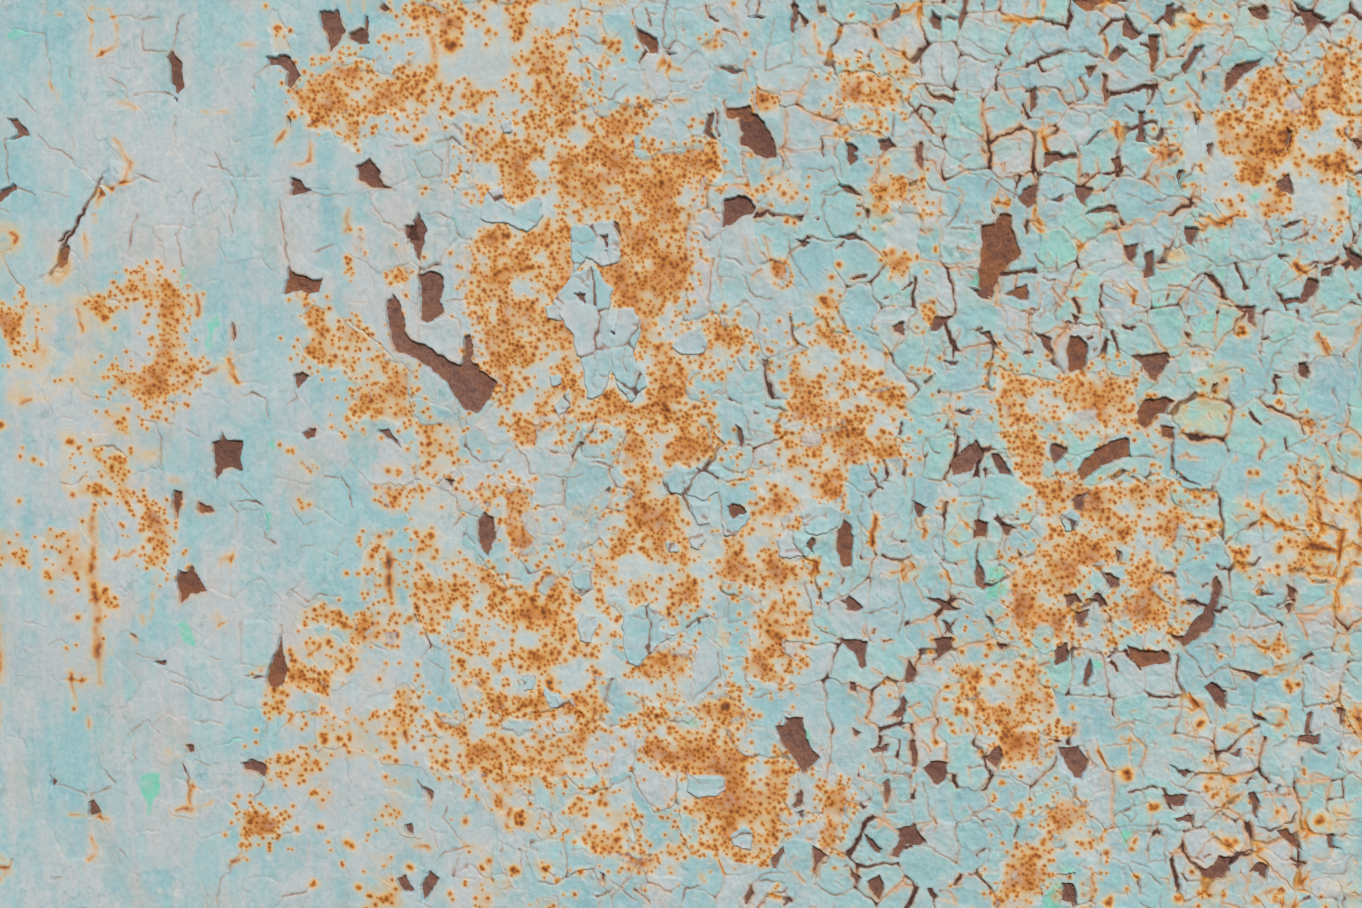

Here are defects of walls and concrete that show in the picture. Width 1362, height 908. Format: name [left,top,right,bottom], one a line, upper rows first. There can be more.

crack [0,0,157,297]
peeling [387,295,497,413]
peeling [727,106,776,158]
rust [804,0,947,339]
peeling [963,214,1028,300]
crack [958,0,1208,215]
rust [0,183,248,732]
crack [837,454,1018,649]
peeling [1059,438,1130,532]
crack [1162,531,1343,733]
rust [533,786,688,890]
rust [1164,626,1362,908]